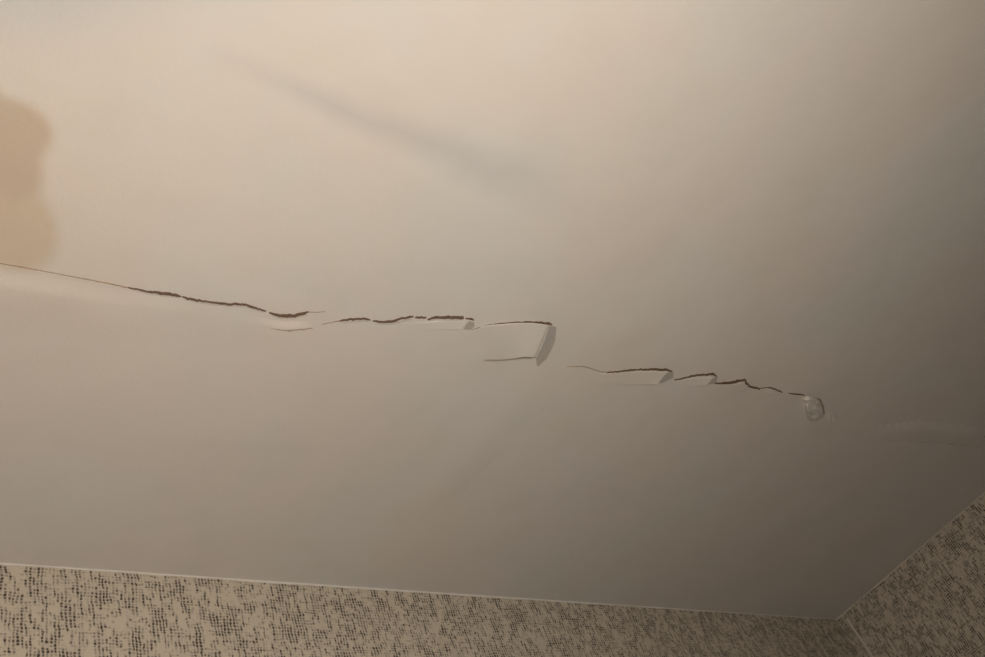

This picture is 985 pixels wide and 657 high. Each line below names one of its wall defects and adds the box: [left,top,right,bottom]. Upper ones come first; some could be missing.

crack [567,366,805,396]